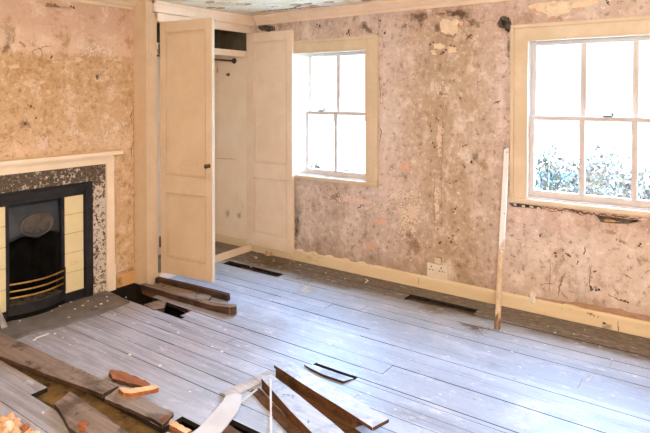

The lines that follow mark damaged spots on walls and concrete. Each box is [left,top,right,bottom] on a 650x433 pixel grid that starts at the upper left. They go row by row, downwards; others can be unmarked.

peeling [529,0,610,20]
peeling [438,19,464,37]
peeling [429,41,457,55]
water stain [319,158,441,248]
spalling [596,215,642,244]